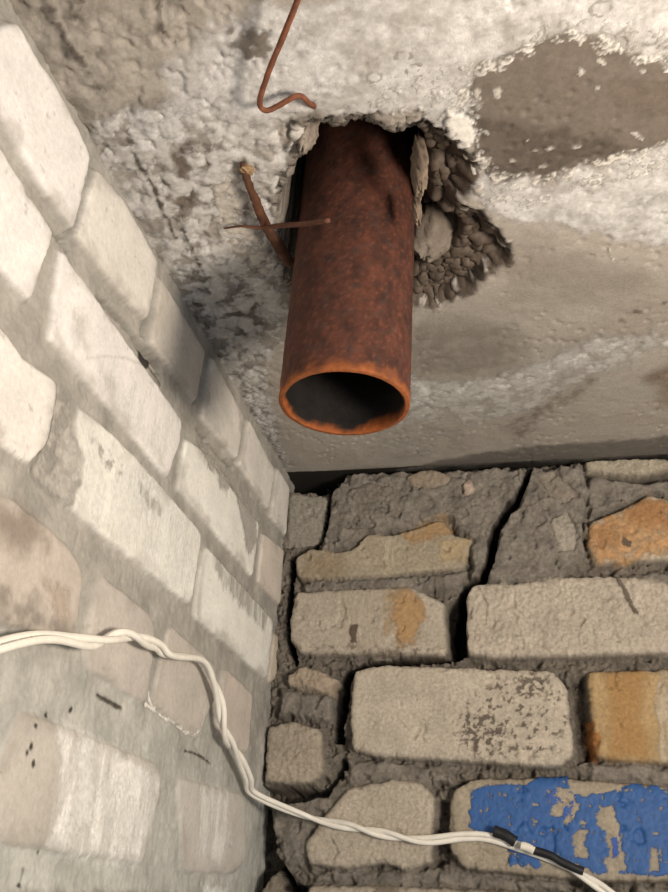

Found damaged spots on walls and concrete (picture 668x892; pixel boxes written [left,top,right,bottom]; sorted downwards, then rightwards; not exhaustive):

water stain [92,0,668,470]
spalling [270,110,514,310]
crack [335,471,532,745]
peeling [468,776,668,877]